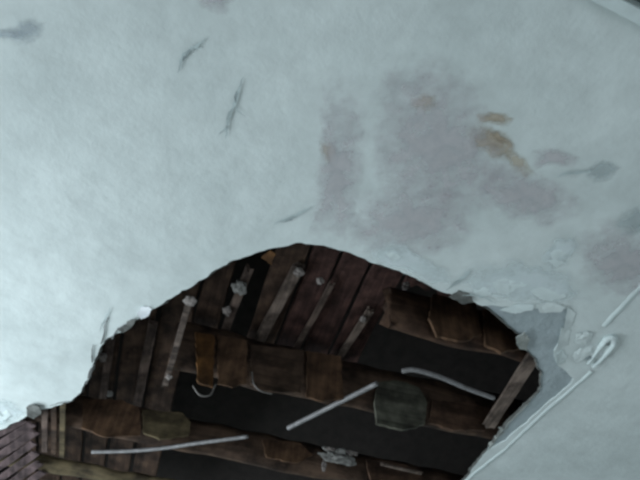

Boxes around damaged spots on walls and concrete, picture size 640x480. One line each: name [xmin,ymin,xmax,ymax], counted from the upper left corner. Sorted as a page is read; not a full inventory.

crack [177,38,206,73]
crack [219,77,244,139]
spalling [51,243,295,407]
flaking render [320,245,576,480]
spalling [0,403,42,428]